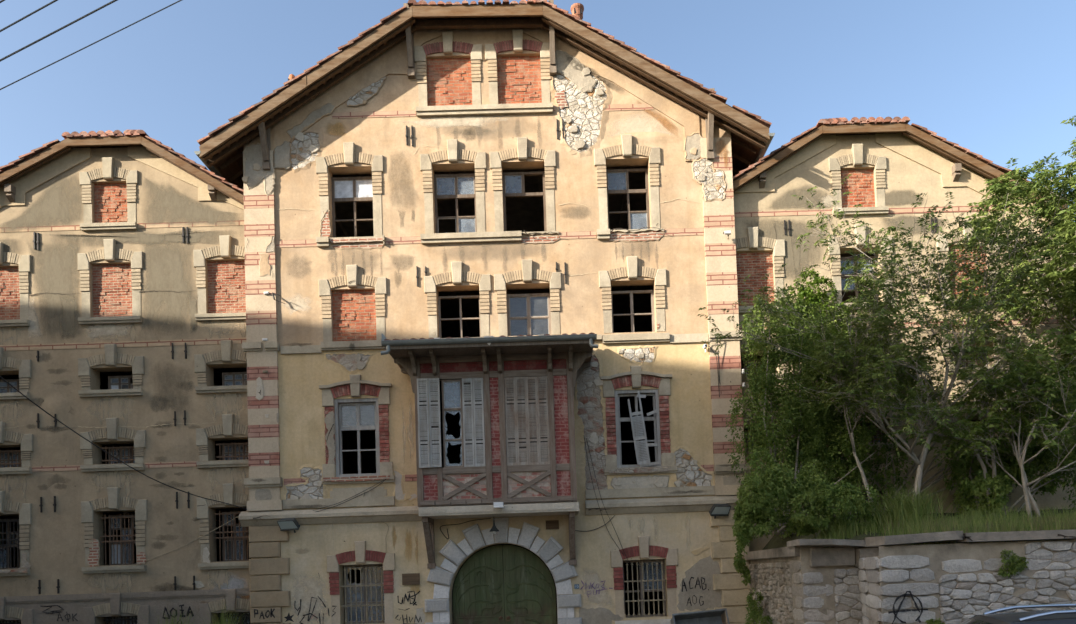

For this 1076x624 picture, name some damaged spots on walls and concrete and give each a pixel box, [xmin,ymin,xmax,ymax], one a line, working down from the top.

flaking render [550,50,613,158]
flaking render [242,130,325,196]
flaking render [684,133,727,202]
water stain [0,179,245,341]
flaking render [324,350,373,374]
flaking render [617,345,659,366]
flaking render [574,350,671,496]
flaking render [255,463,417,503]